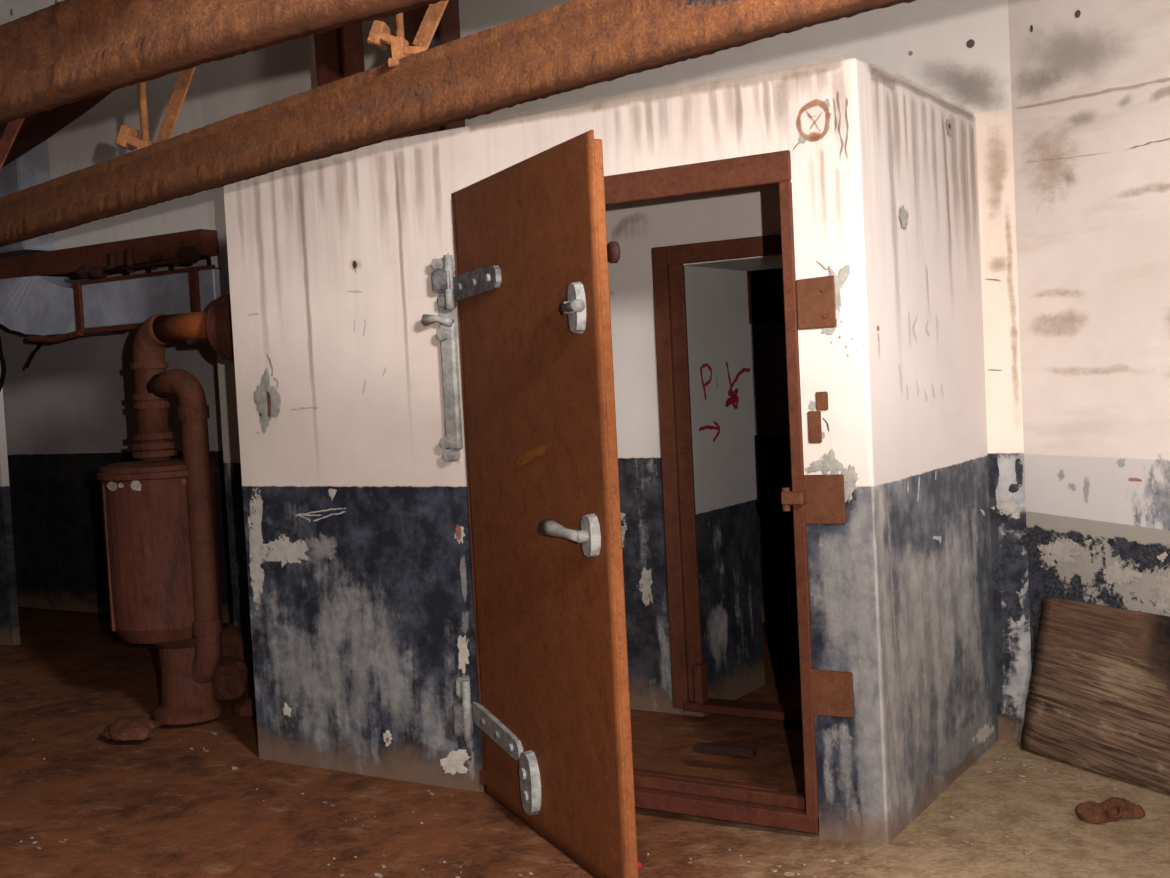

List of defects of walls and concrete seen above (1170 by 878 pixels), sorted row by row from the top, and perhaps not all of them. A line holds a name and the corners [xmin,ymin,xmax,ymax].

rust [793,99,831,150]
spalling [253,355,281,435]
peeling [248,487,336,614]
peeling [639,567,653,606]
peeling [805,401,902,802]
peeling [991,457,1170,630]
peeling [658,623,671,689]